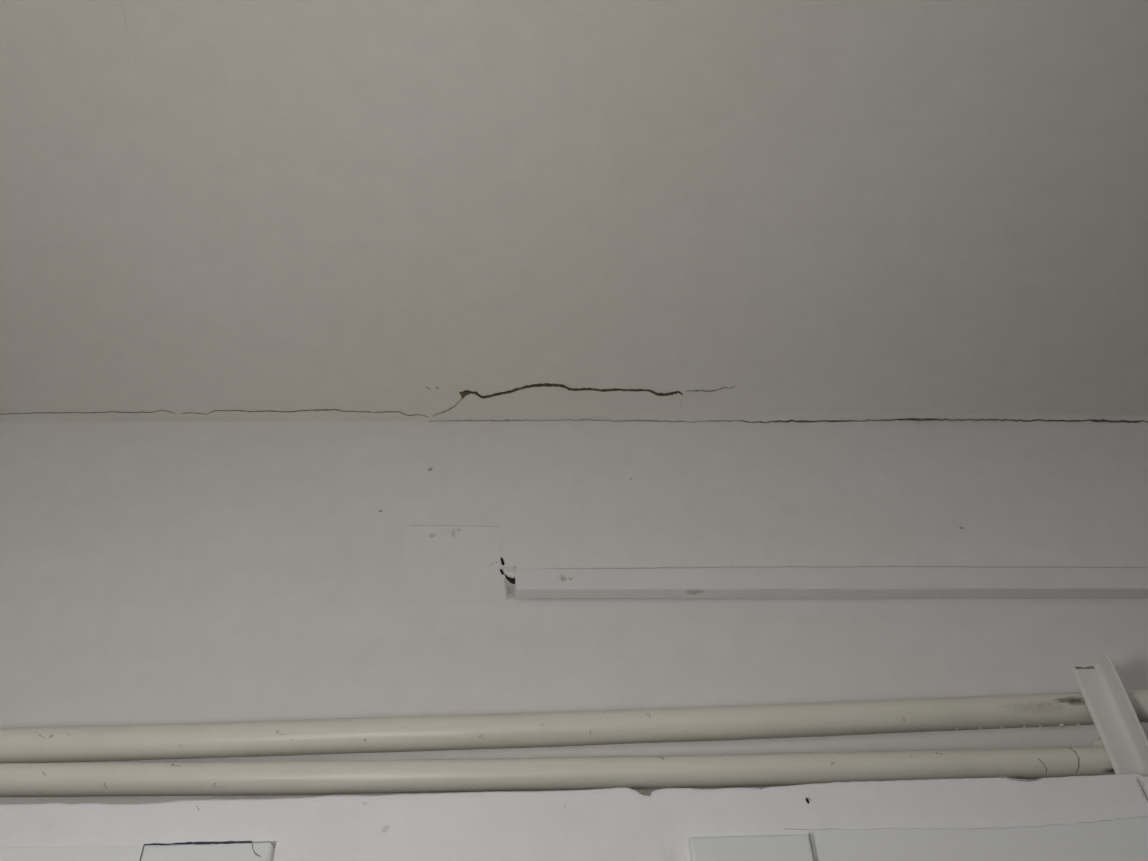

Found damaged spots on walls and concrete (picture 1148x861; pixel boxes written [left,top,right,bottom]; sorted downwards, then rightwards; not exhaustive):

crack [1,383,1148,423]